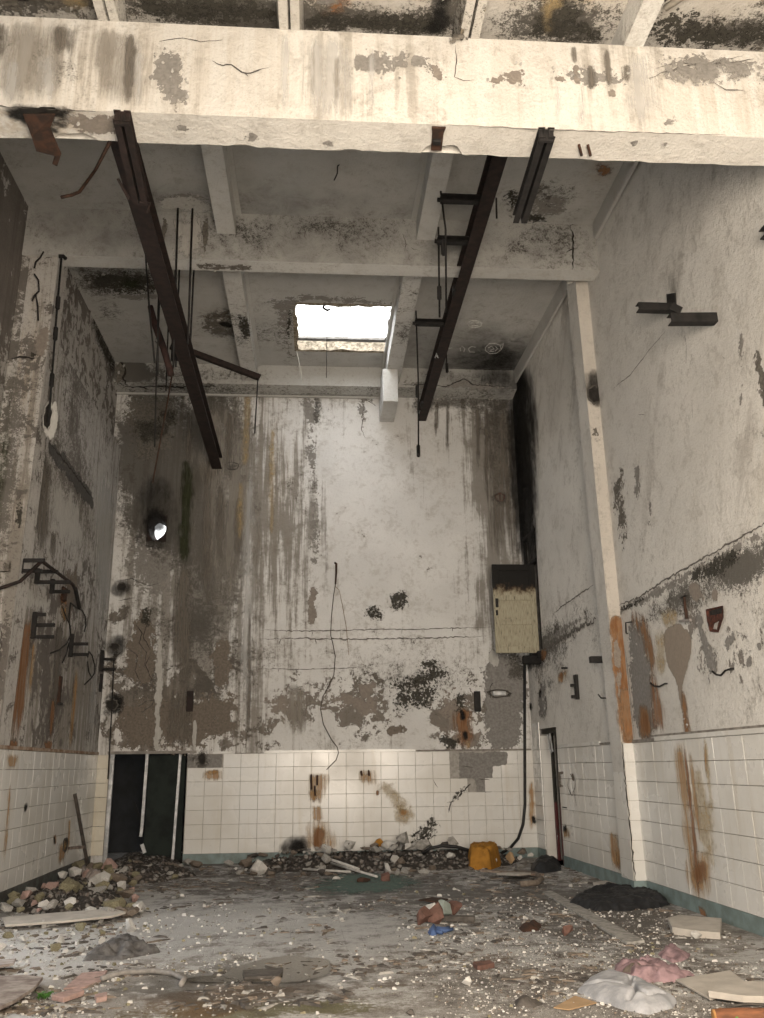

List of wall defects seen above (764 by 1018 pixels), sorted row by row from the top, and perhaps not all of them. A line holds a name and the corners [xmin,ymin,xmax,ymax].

leakage [0,26,71,91]
leakage [98,31,136,99]
peeling [149,47,189,112]
crack [159,38,264,76]
peeling [738,333,764,406]
leakage [414,398,520,548]
spalling [263,687,312,729]
spalling [324,678,508,793]
corrosion [610,615,634,743]
corrosion [308,775,332,847]
corrosion [676,748,709,893]